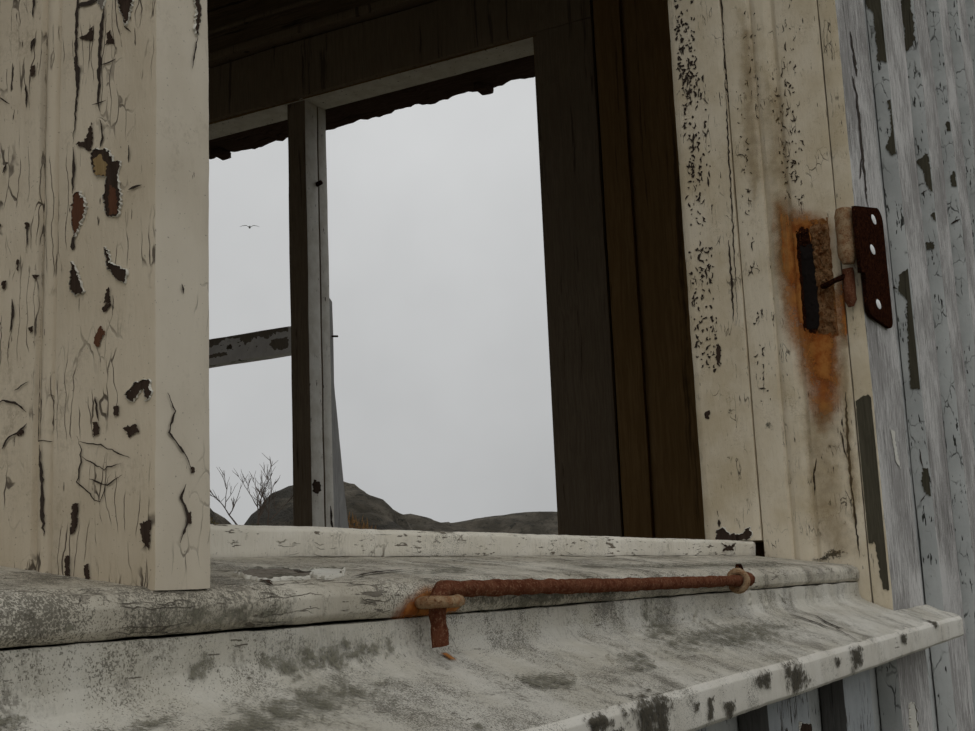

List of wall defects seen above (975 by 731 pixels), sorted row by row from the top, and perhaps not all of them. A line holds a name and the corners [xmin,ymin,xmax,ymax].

crack [0,0,47,108]
peeling [68,0,141,297]
crack [1,188,44,333]
rust [776,205,848,423]
crack [0,374,52,534]
crack [76,398,128,502]
crack [168,394,195,543]
peeling [855,394,889,591]
peeling [232,566,402,585]
rust [360,588,432,620]
peeling [786,721,812,731]